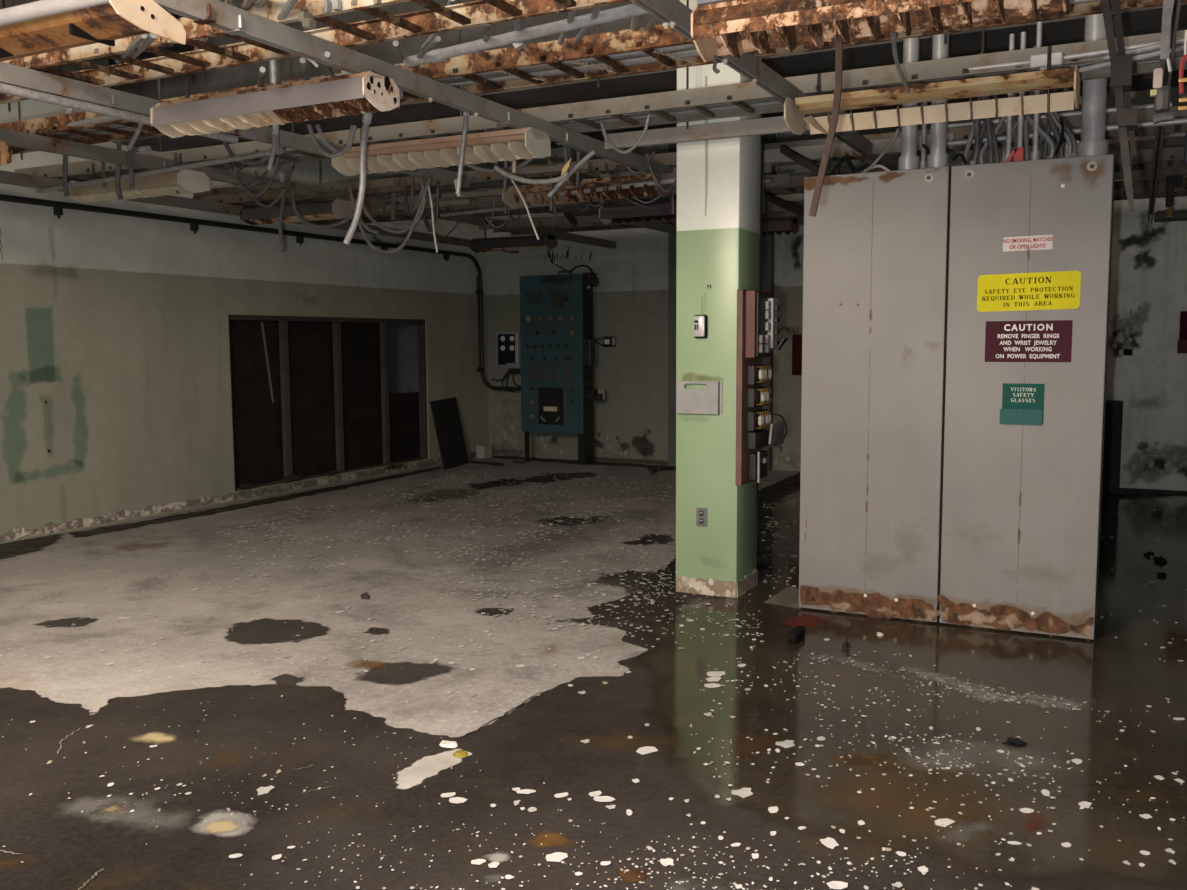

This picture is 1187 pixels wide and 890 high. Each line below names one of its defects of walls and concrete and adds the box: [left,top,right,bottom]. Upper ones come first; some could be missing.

leakage [1120,222,1166,269]
leakage [1102,488,1187,501]
leakage [757,473,800,571]
flaking render [676,569,758,598]
leakage [0,534,1187,890]